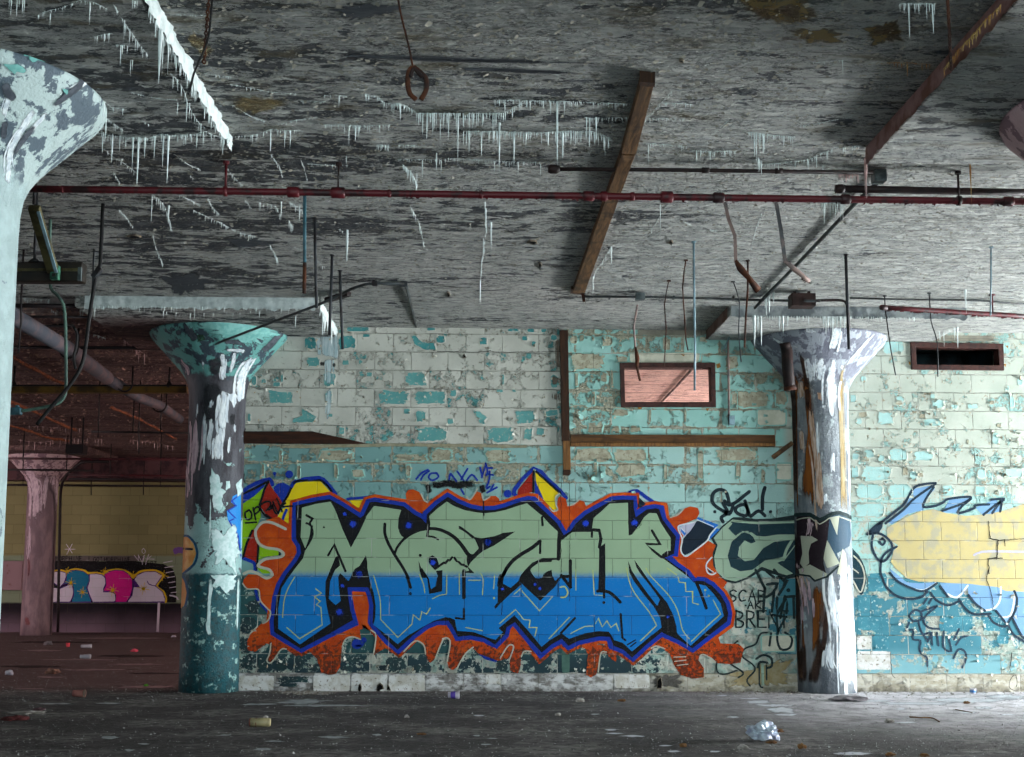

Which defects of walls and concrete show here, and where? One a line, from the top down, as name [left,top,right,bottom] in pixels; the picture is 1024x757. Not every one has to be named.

peeling [2,83,16,101]
leakage [38,0,630,190]
leakage [3,110,46,182]
peeling [9,0,1024,497]
peeling [850,445,935,519]
peeling [760,634,796,652]
peeling [856,573,918,670]
peeling [918,593,1023,682]